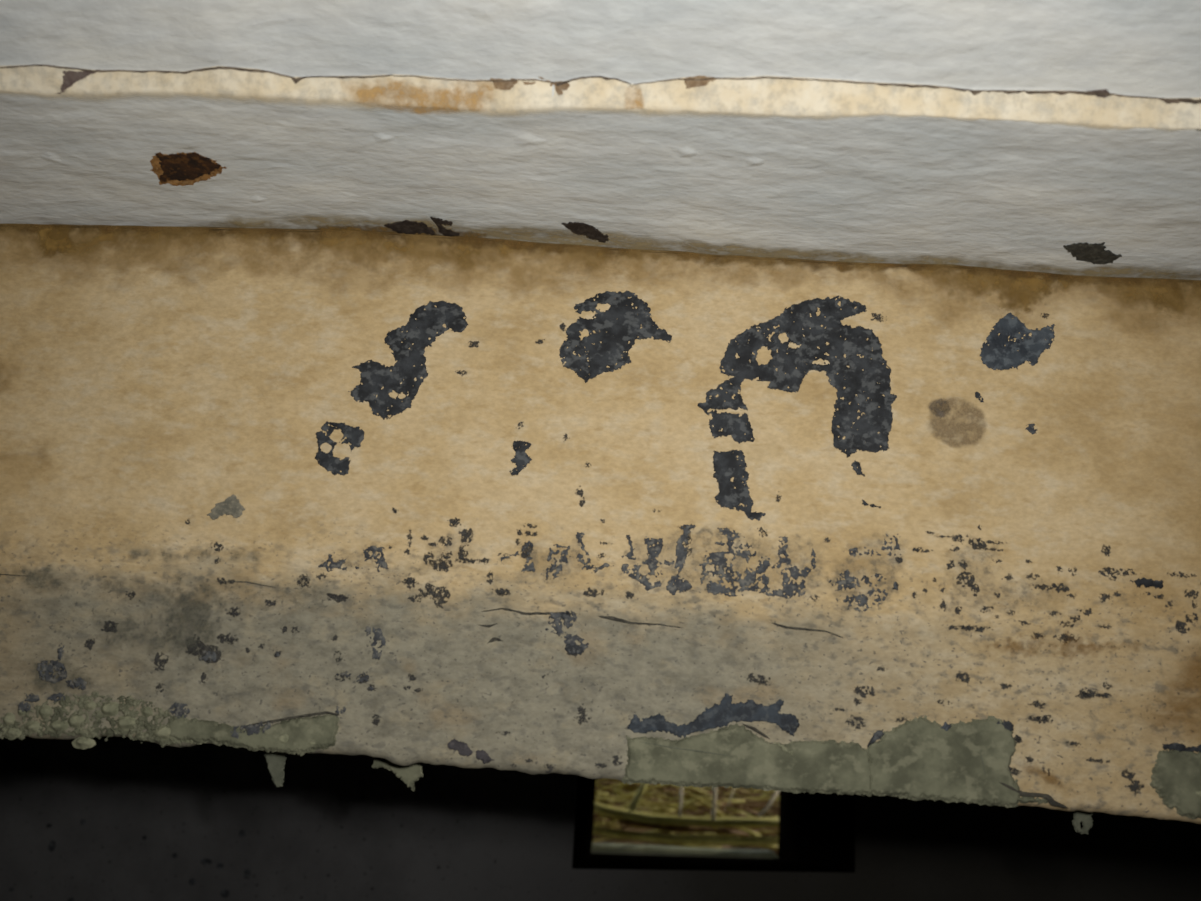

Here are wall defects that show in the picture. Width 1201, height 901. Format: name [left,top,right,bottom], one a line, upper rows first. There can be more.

crack [0,64,1201,130]
corrosion [150,152,227,186]
peeling [384,217,460,237]
peeling [561,222,609,243]
peeling [1063,242,1122,264]
peeling [980,312,1055,370]
leakage [930,392,984,446]
peeling [297,290,897,608]
peeling [207,494,245,520]
peeling [829,534,933,612]
peeling [185,633,281,683]
peeling [627,693,800,738]